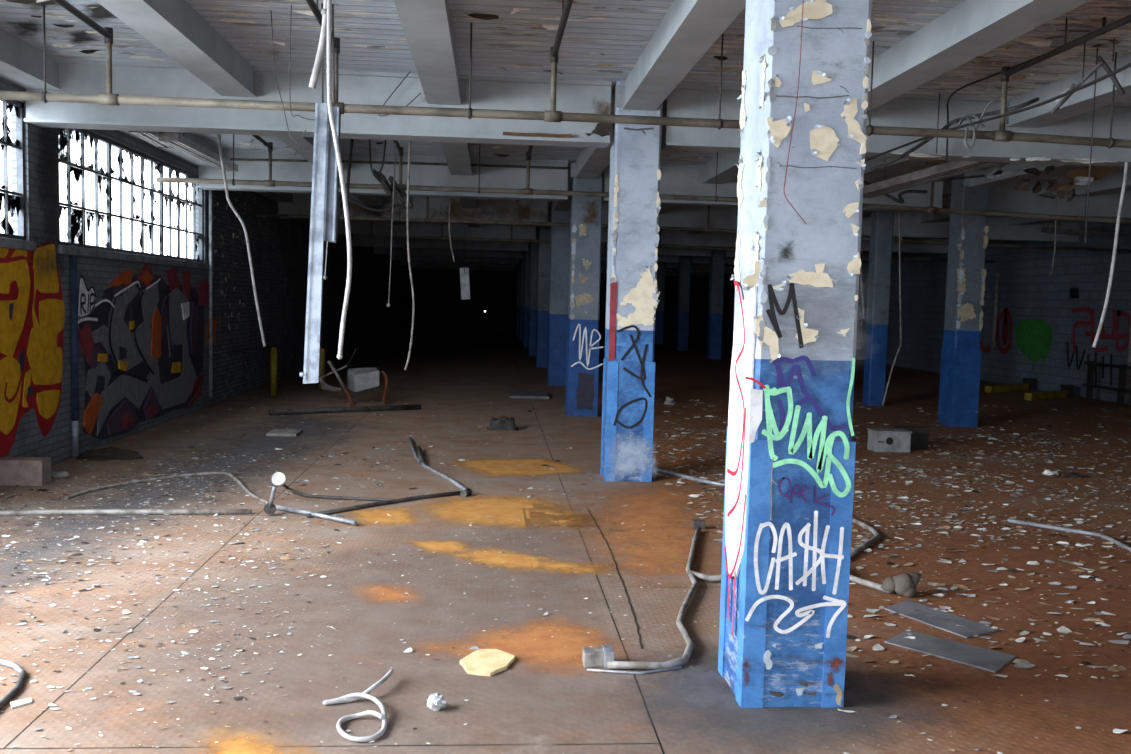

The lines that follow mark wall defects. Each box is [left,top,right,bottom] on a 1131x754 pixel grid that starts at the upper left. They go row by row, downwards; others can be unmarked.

peeling [466,0,646,34]
peeling [770,0,836,32]
spalling [585,123,614,137]
peeling [810,19,915,237]
peeling [570,224,596,319]
peeling [610,169,619,283]
peeling [616,155,669,327]
peeling [730,46,837,363]
peeling [956,227,987,331]
rust [351,437,714,576]
rust [210,734,282,754]